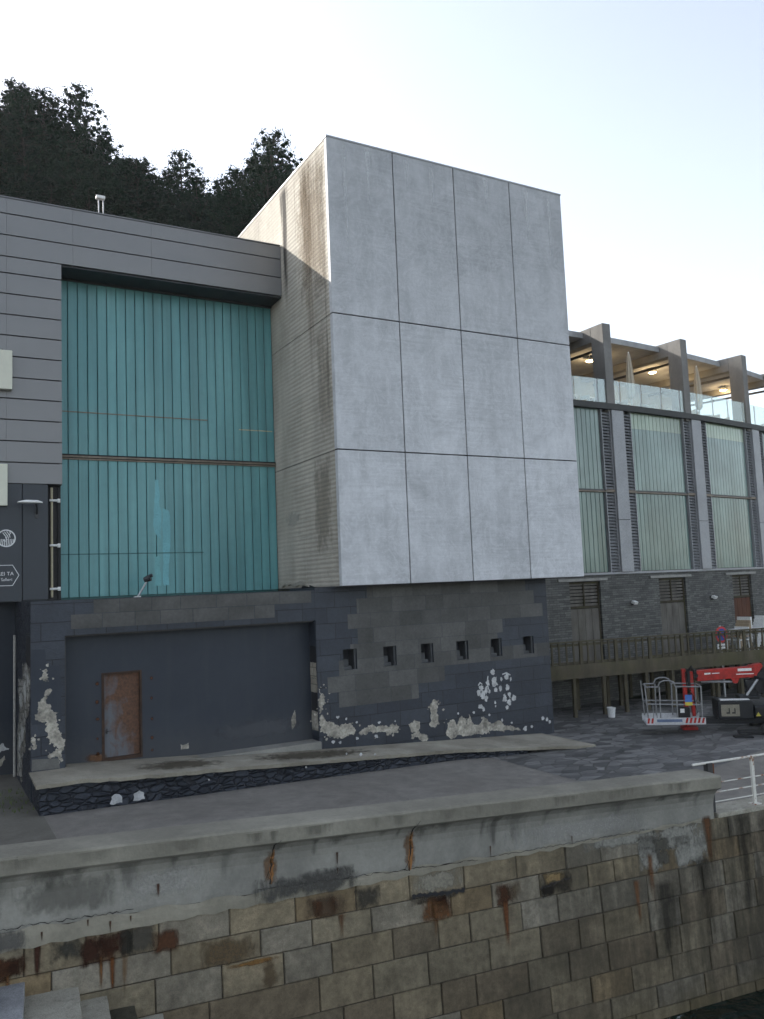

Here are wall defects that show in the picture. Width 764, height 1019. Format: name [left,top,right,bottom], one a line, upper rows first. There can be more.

peeling [29,649,65,771]
peeling [309,622,551,756]
peeling [110,791,145,805]
damp [255,866,380,909]
rust [307,894,344,928]
rust [496,884,518,941]
rust [0,932,43,986]
damp [55,939,82,960]
rust [81,916,179,986]